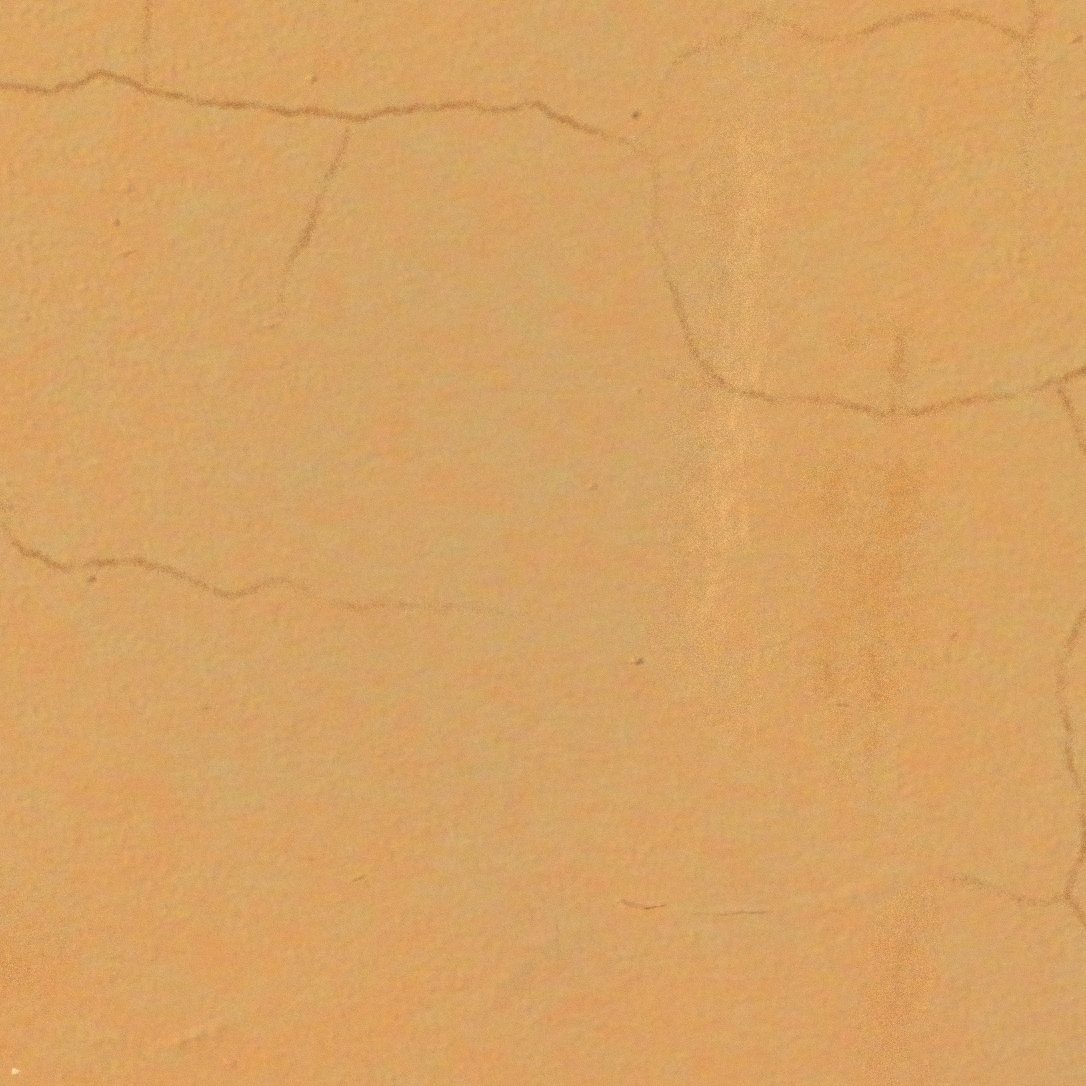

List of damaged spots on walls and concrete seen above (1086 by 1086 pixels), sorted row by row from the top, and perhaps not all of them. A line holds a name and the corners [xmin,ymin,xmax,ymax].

crack [0,0,1086,456]
crack [0,499,522,618]
crack [932,610,1086,927]